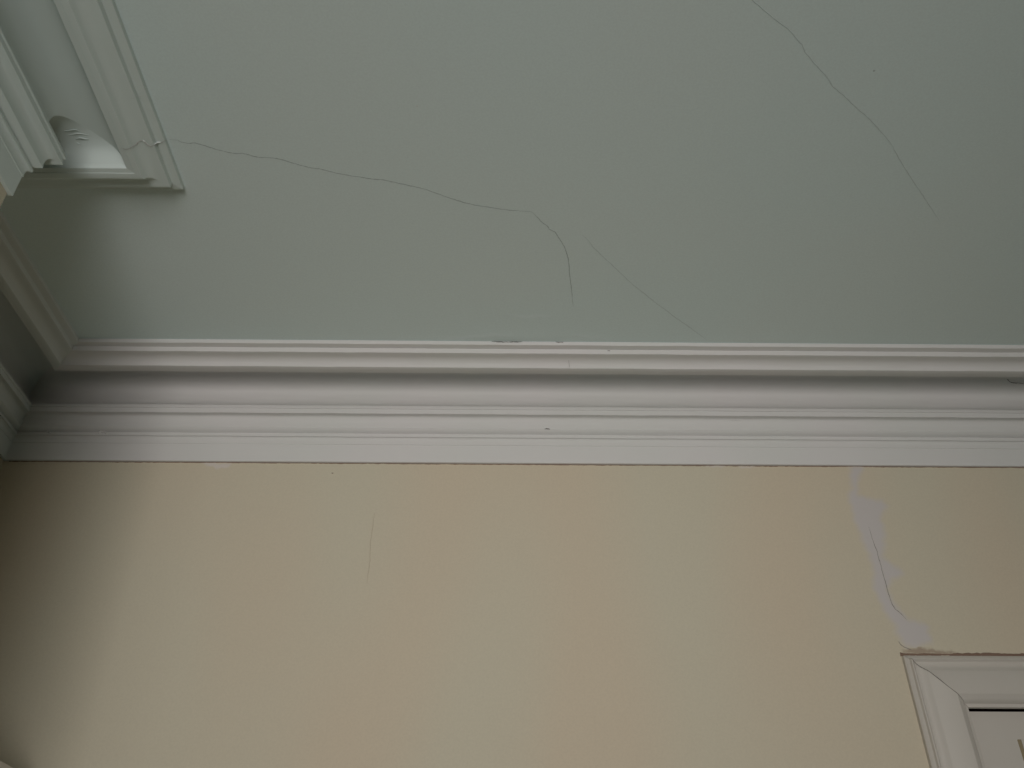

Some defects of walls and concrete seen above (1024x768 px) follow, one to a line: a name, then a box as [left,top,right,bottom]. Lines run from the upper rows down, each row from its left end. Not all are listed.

crack [123,139,704,338]
crack [869,529,1024,700]